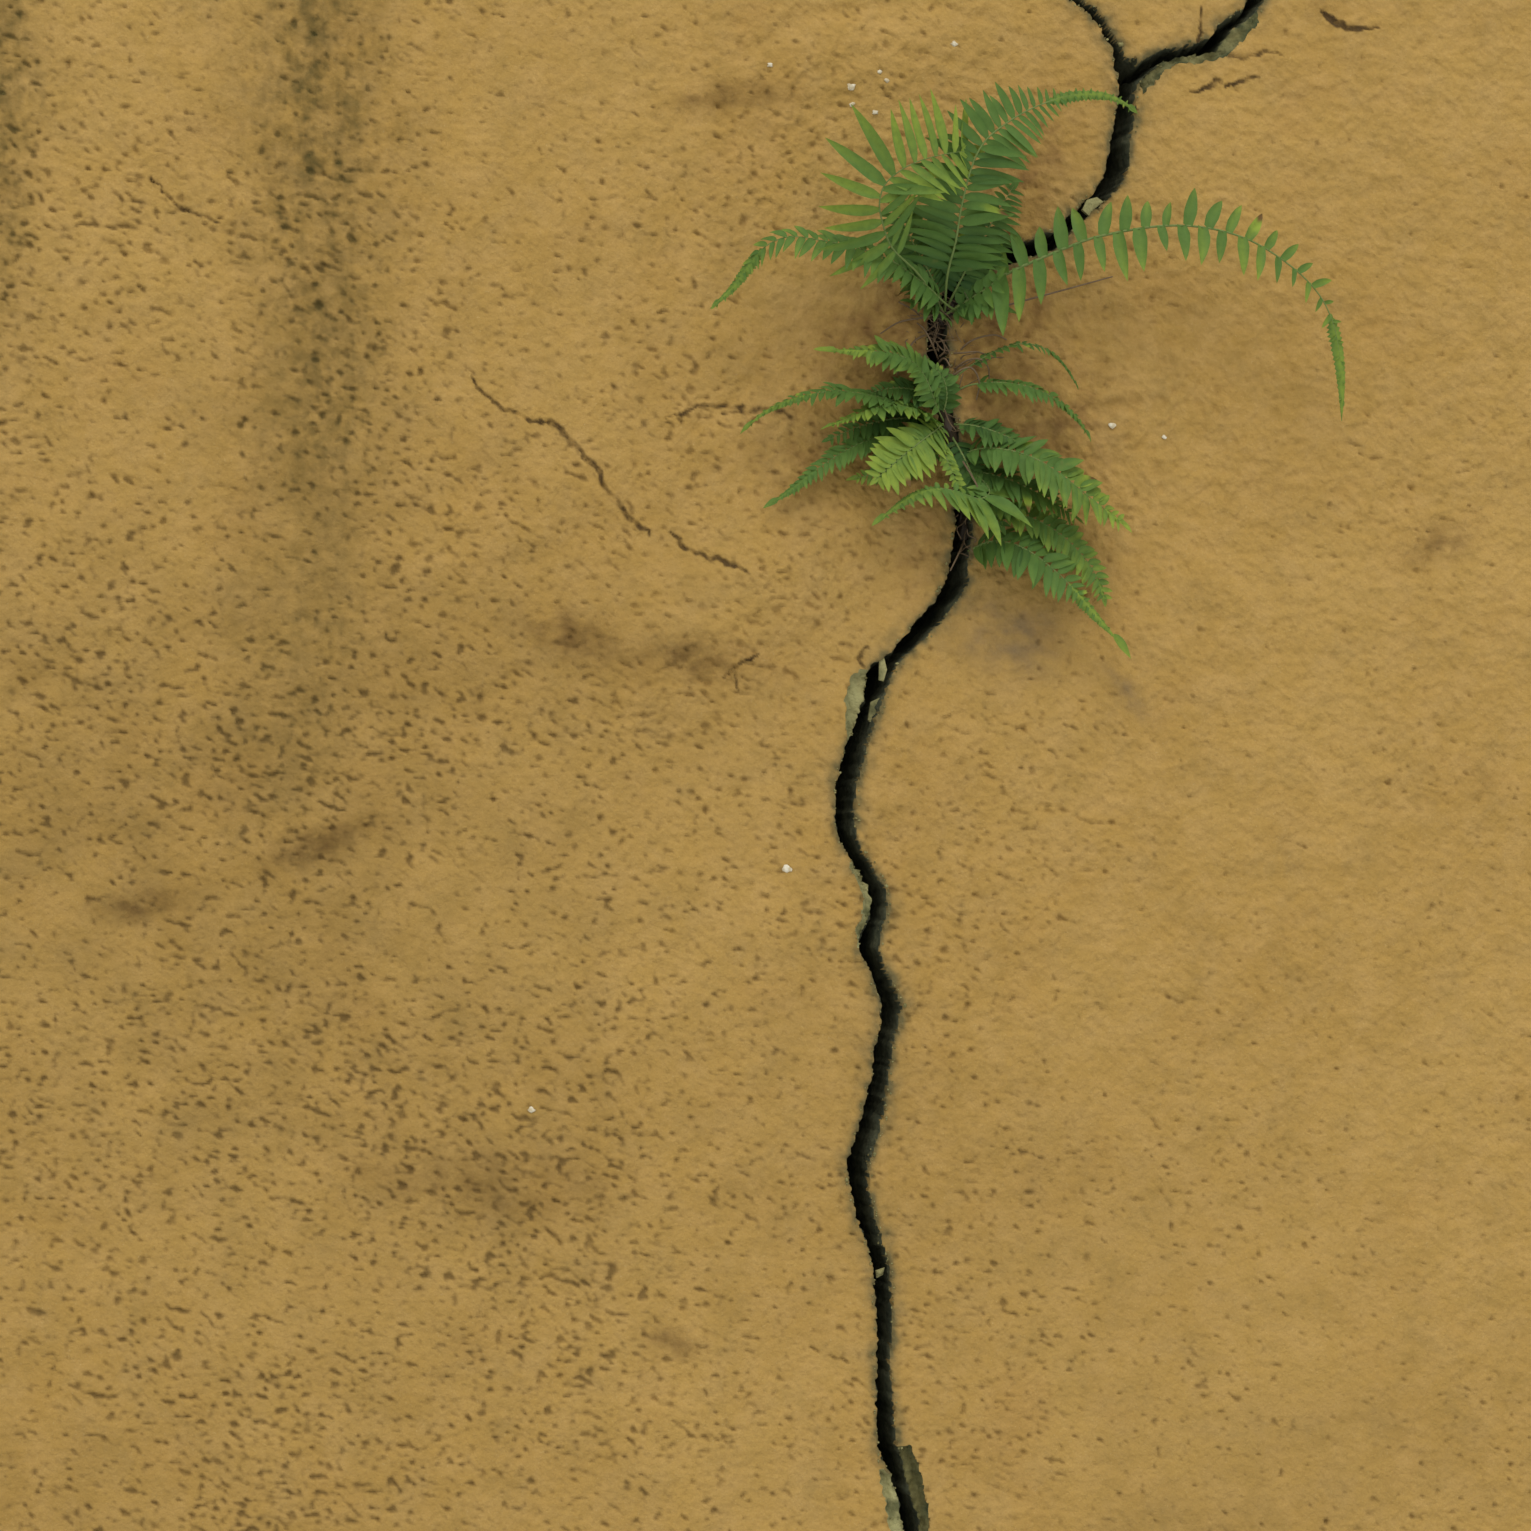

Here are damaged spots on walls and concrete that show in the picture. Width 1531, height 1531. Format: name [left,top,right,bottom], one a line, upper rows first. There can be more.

crack [926,0,1267,373]
crack [833,413,973,1531]